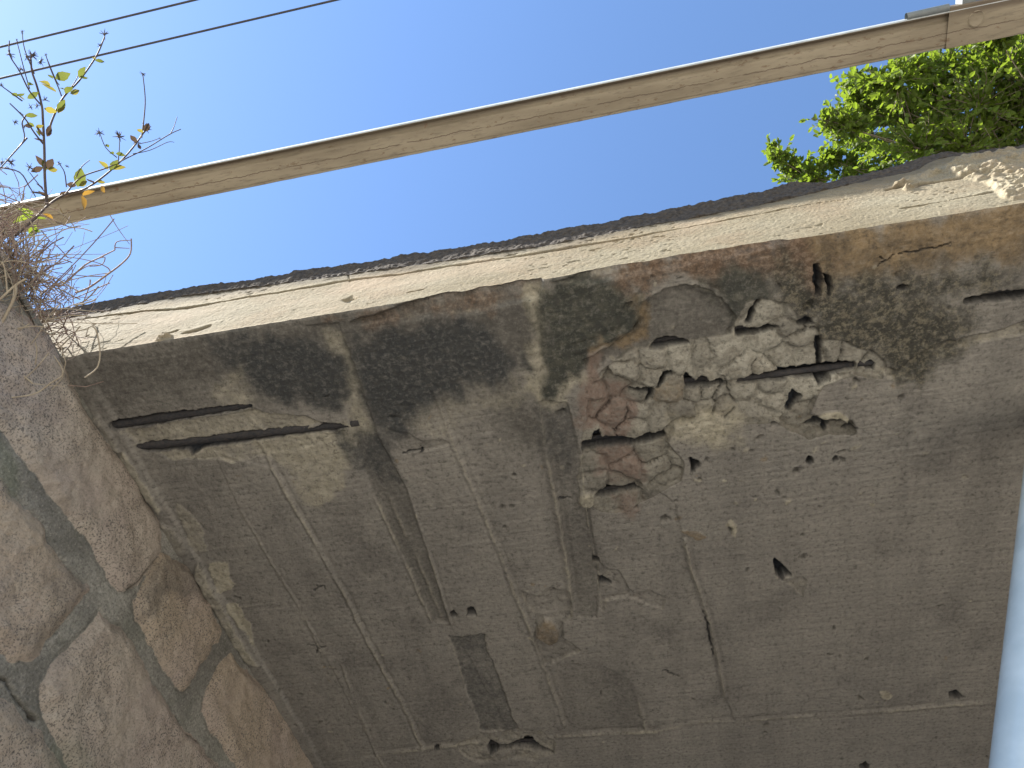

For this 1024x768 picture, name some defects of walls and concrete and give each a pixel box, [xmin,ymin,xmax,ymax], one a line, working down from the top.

crack [877,242,953,267]
water stain [60,282,595,515]
spalling [576,284,889,515]
spalling [118,408,347,464]
hole [772,558,793,583]
crack [702,610,716,657]
peeling [446,633,558,764]